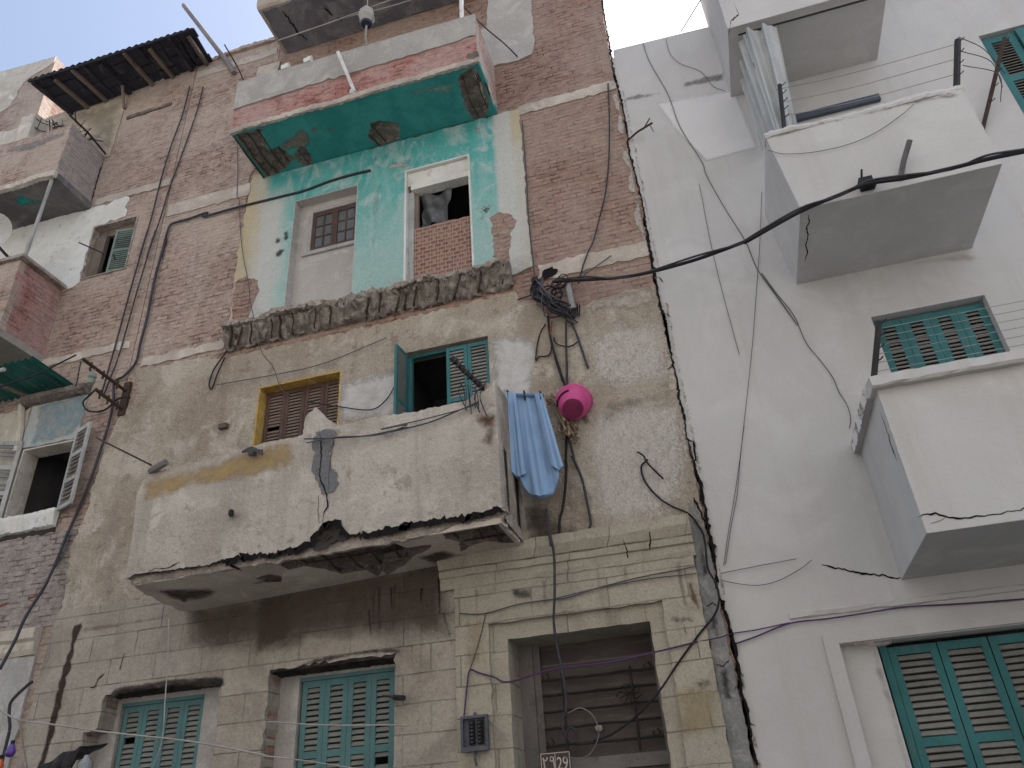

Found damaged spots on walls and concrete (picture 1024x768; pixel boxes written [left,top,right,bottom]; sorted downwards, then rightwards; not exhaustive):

spalling [234,128,316,179]
spalling [368,121,400,146]
spalling [490,212,517,285]
crack [803,215,811,261]
spalling [229,276,259,348]
crack [601,0,758,766]
water stain [147,444,290,497]
crack [126,436,335,579]
crack [919,508,1024,524]
spalling [130,506,524,585]
crack [821,564,901,579]